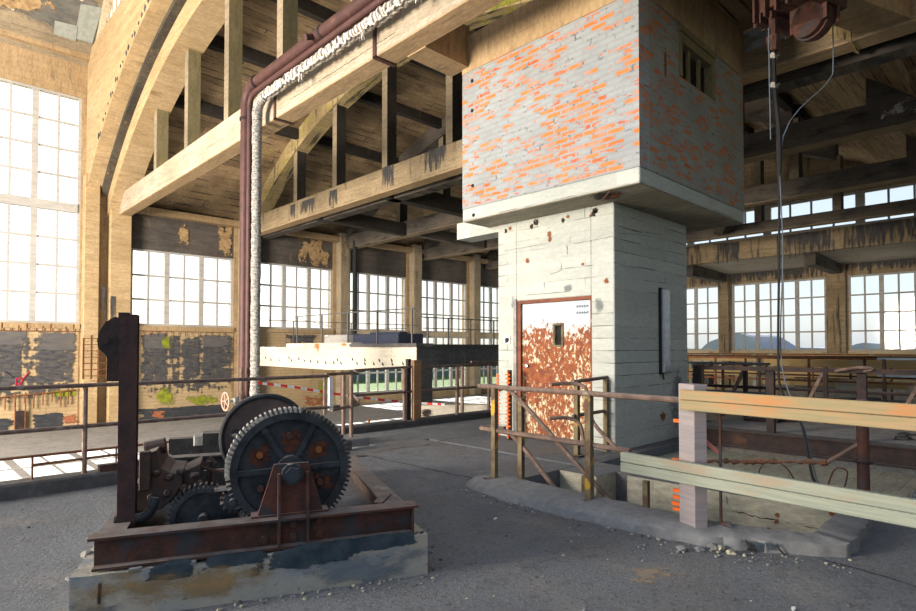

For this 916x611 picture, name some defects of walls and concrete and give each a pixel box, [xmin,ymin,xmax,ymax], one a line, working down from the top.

peeling [0,0,97,28]
water stain [424,145,446,171]
water stain [382,163,394,187]
water stain [289,198,314,220]
water stain [716,242,739,264]
water stain [728,267,823,282]
water stain [777,229,835,257]
water stain [845,258,916,271]
water stain [847,218,916,249]
peeling [0,323,107,431]
peeling [140,331,233,397]
peeling [138,405,228,420]